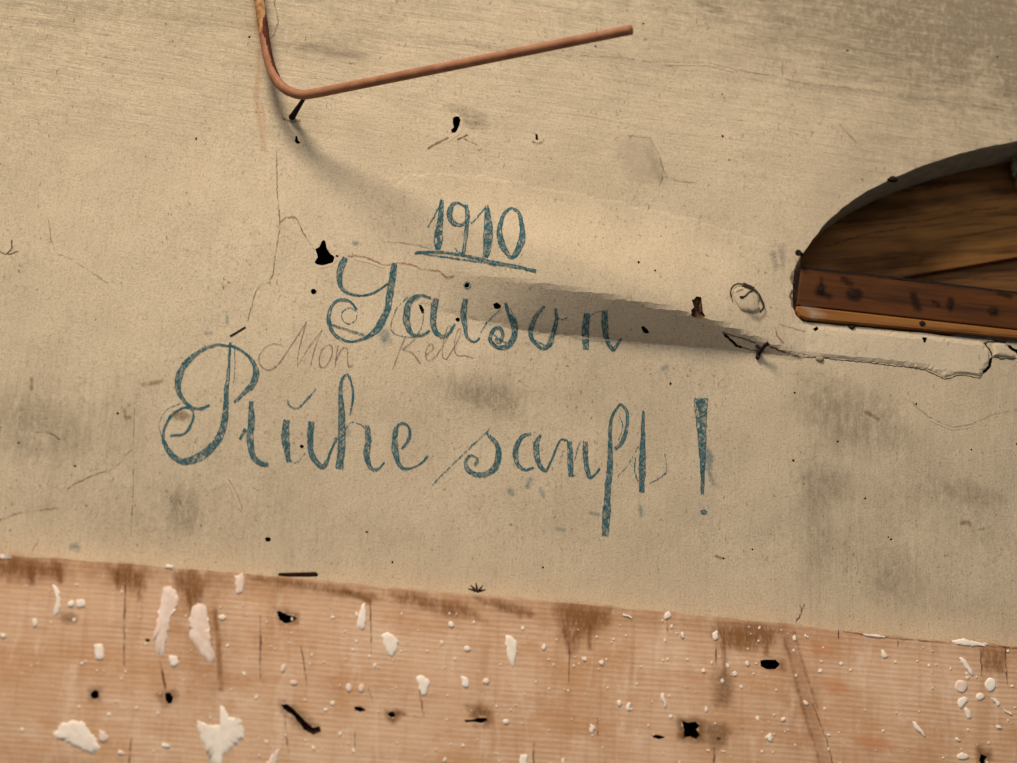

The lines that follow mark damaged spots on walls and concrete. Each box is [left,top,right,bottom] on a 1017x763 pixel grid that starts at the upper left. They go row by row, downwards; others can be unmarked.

crack [722,257,1017,380]
water stain [0,557,62,581]